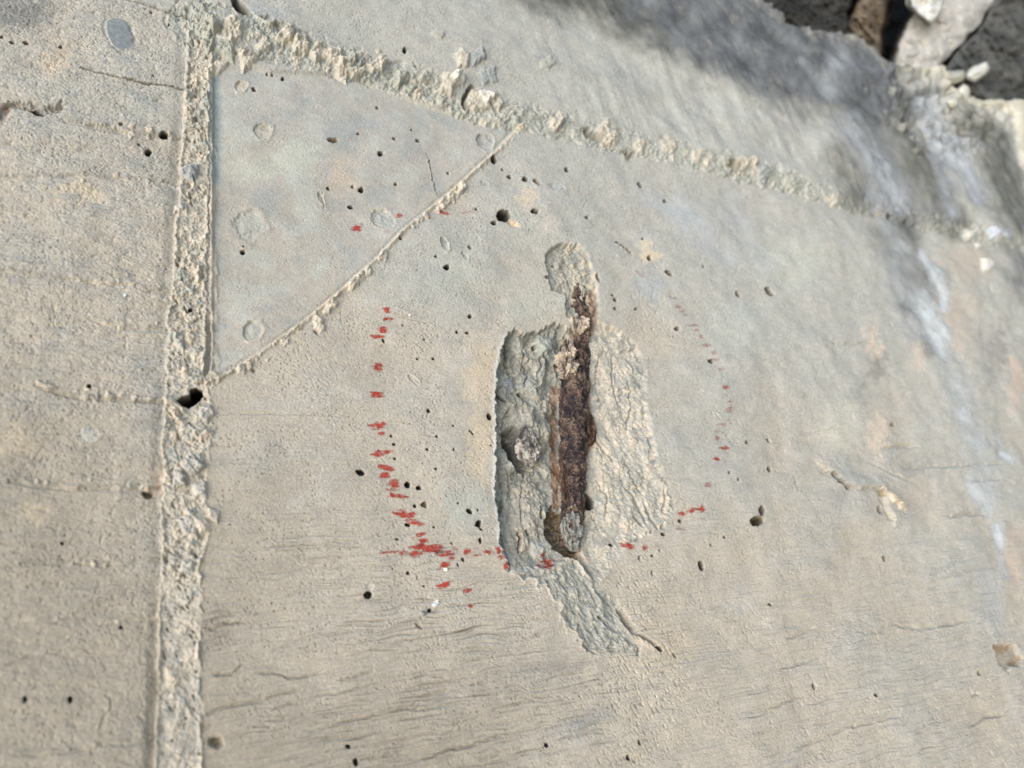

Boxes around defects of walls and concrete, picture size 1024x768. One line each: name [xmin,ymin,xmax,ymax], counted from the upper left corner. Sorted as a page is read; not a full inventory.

spalling [494,240,676,659]
rust [585,398,597,454]
rust [552,462,571,504]